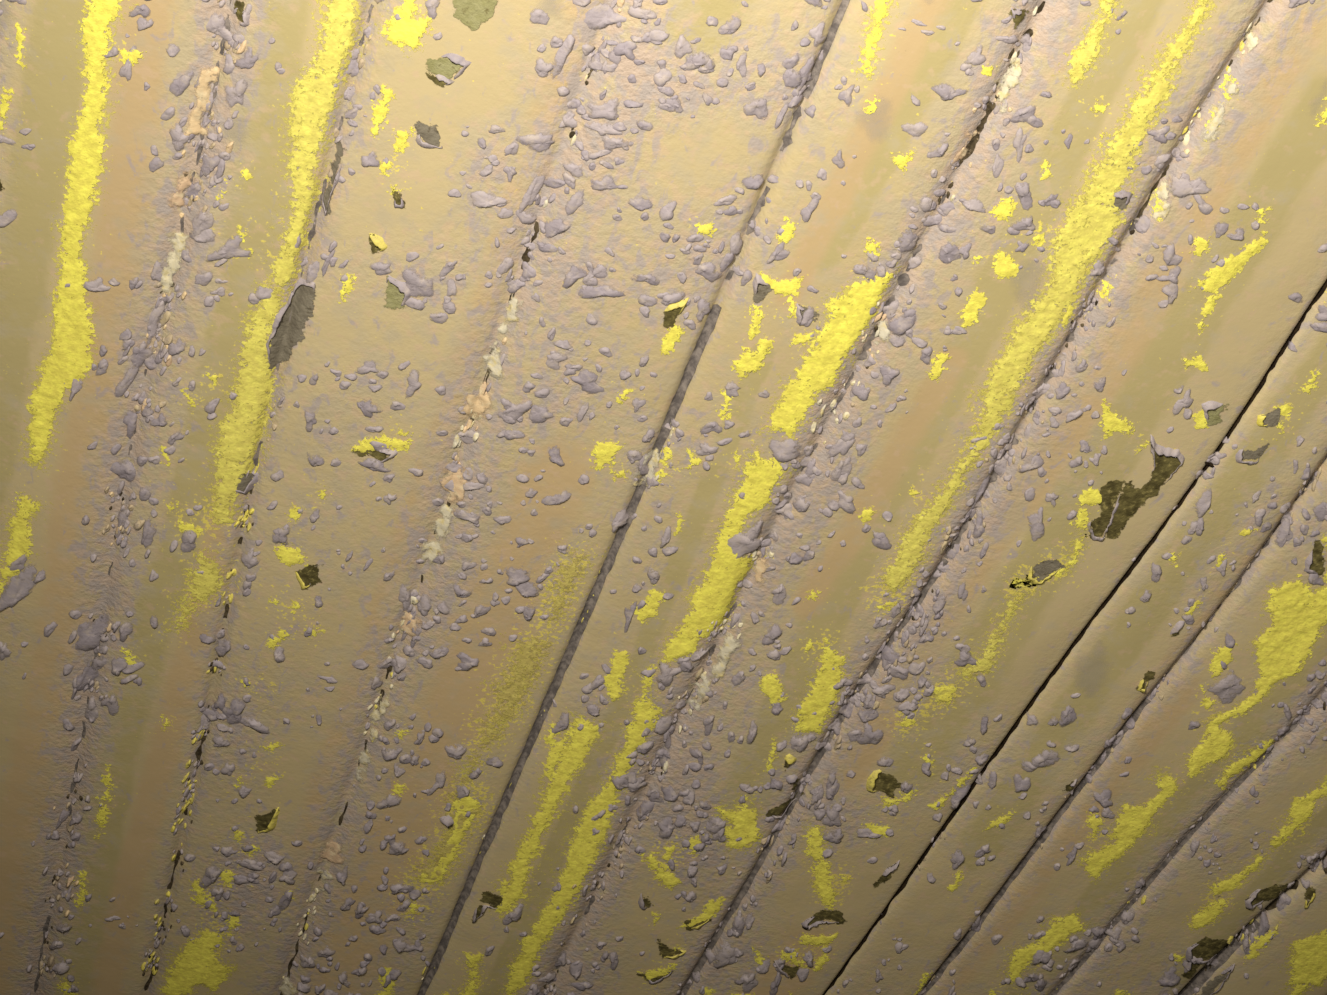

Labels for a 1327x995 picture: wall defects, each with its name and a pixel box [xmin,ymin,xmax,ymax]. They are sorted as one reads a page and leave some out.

peeling [1204,74,1239,142]
peeling [1315,97,1327,127]
peeling [1188,207,1273,335]
peeling [159,0,472,638]
peeling [1300,369,1321,394]
peeling [1235,404,1294,465]
peeling [265,625,325,650]
peeling [1071,534,1327,885]
peeling [1173,775,1327,995]
peeling [999,908,1095,994]